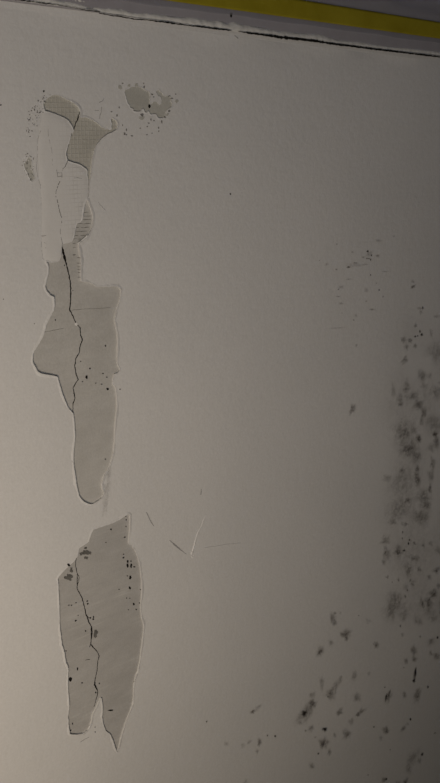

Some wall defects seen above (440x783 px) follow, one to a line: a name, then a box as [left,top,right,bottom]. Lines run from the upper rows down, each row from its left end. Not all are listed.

crack [20,0,440,57]
crack [36,99,104,411]
peeling [31,83,178,506]
crack [75,558,99,706]
peeling [56,512,146,753]